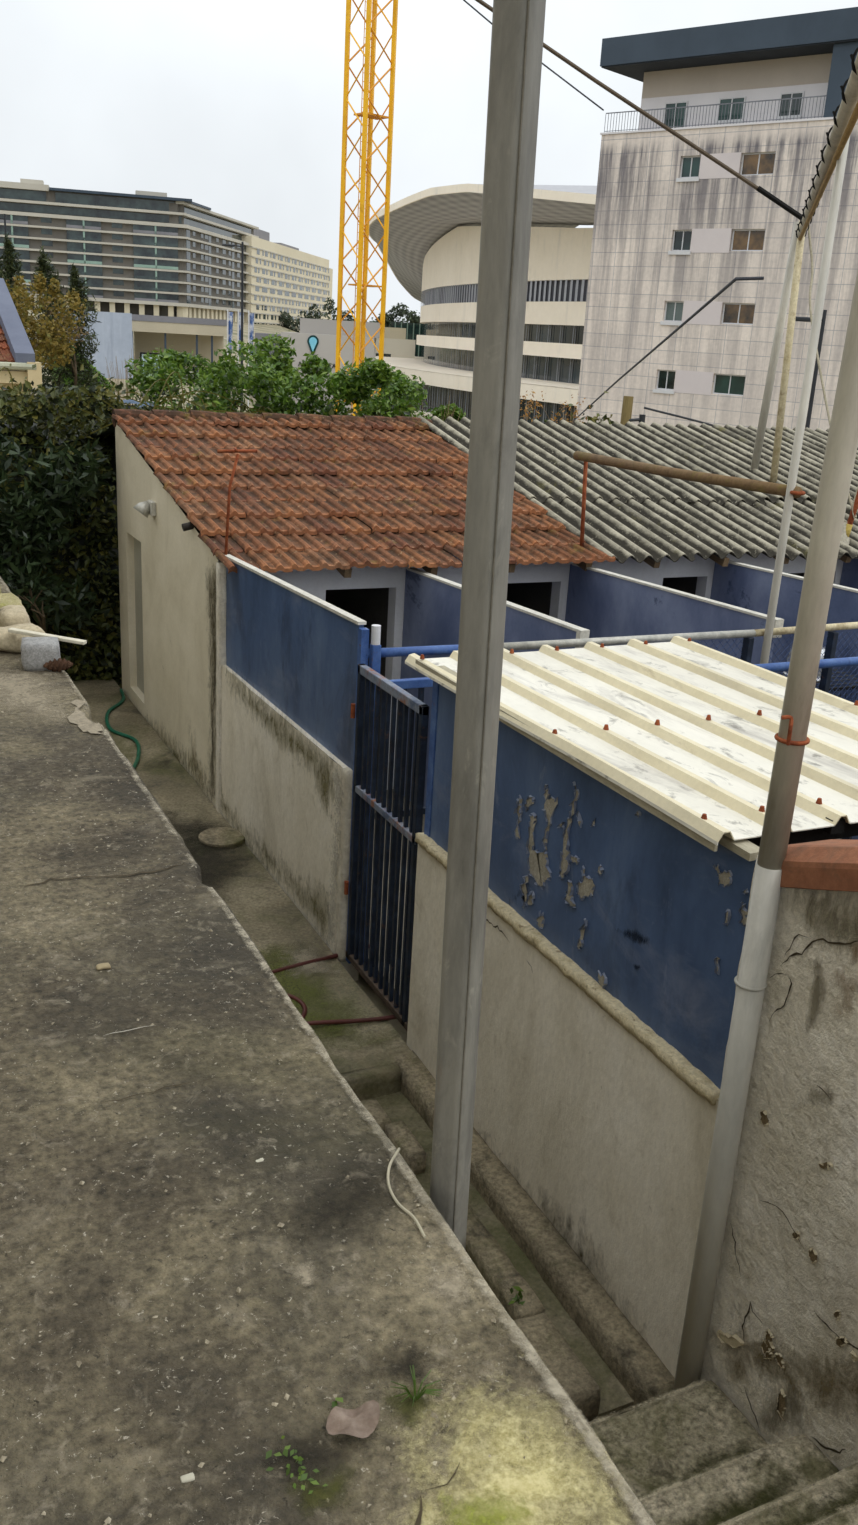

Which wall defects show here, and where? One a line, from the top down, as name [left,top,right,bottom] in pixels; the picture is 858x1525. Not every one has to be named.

peeling [513,781,604,950]
crack [770,934,858,1019]
damp [810,963,821,1024]